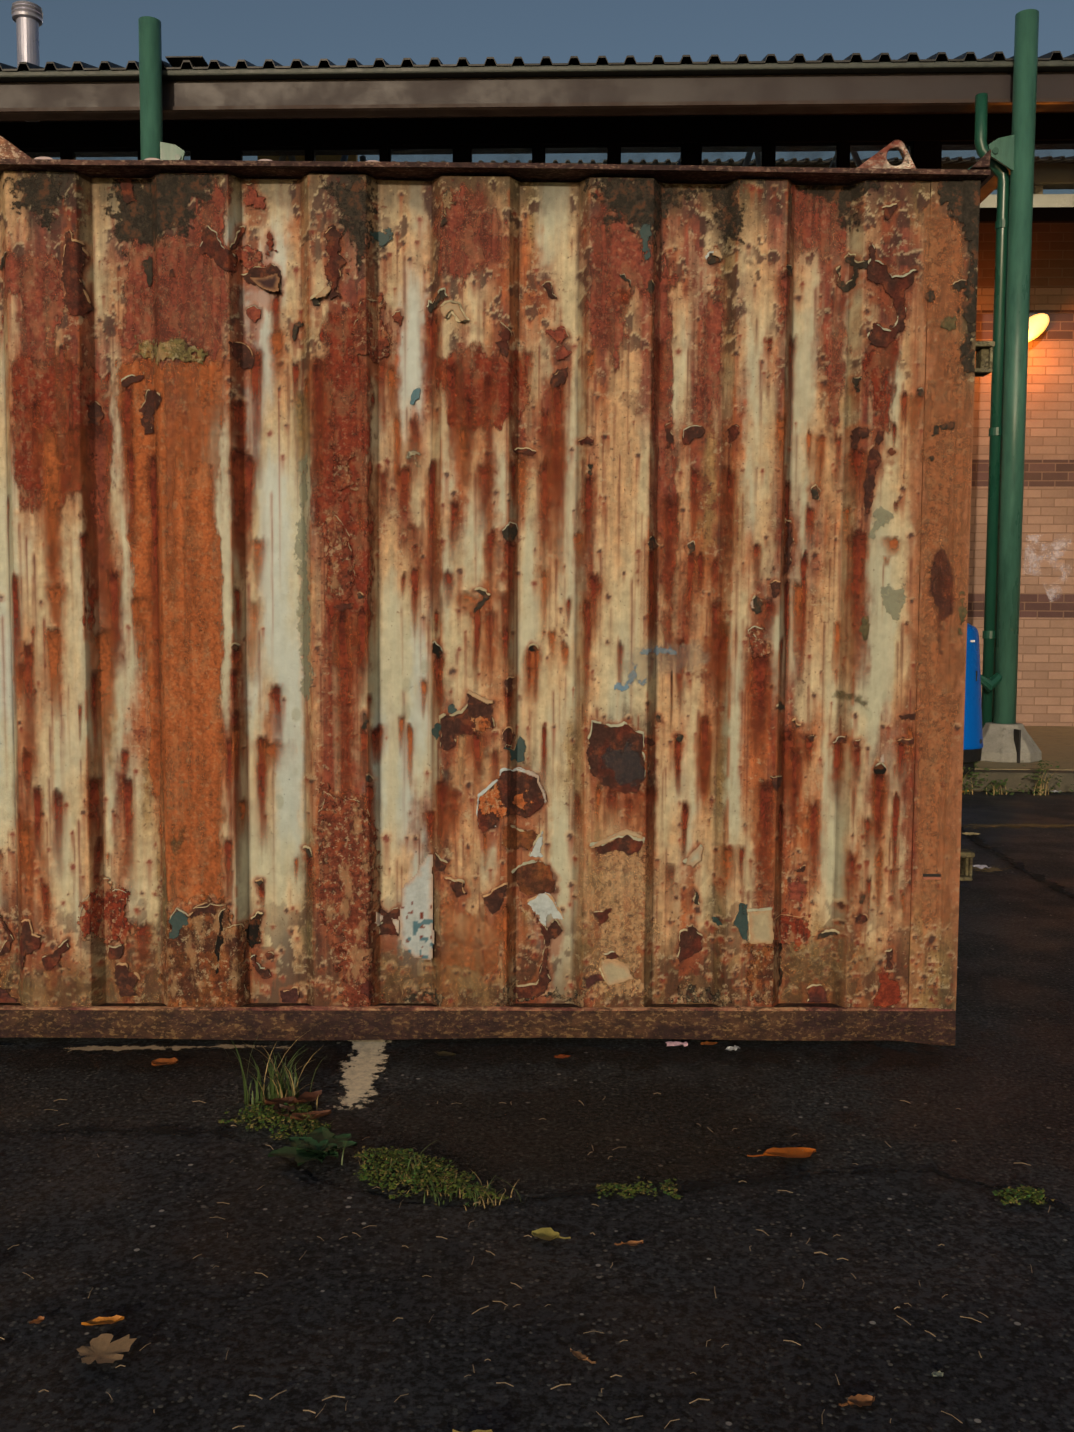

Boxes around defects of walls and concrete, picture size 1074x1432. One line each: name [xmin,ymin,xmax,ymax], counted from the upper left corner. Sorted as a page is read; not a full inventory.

corrosion [4,178,602,919]
corrosion [585,205,739,708]
corrosion [746,481,820,730]
corrosion [807,206,973,925]
corrosion [0,574,69,1002]
peeling [164,903,222,955]
peeling [227,911,274,960]
peeling [375,854,434,960]
peeling [503,732,547,802]
corrosion [513,720,659,1006]
peeling [599,959,634,986]
peeling [711,902,808,944]